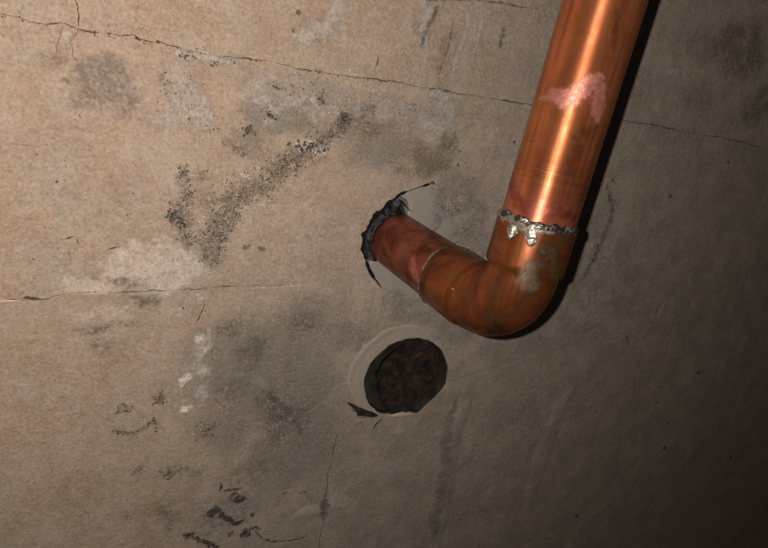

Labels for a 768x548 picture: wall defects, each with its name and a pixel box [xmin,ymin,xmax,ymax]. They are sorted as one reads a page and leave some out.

crack [1,3,189,69]
crack [217,56,532,106]
crack [6,292,96,300]
crack [116,288,208,324]